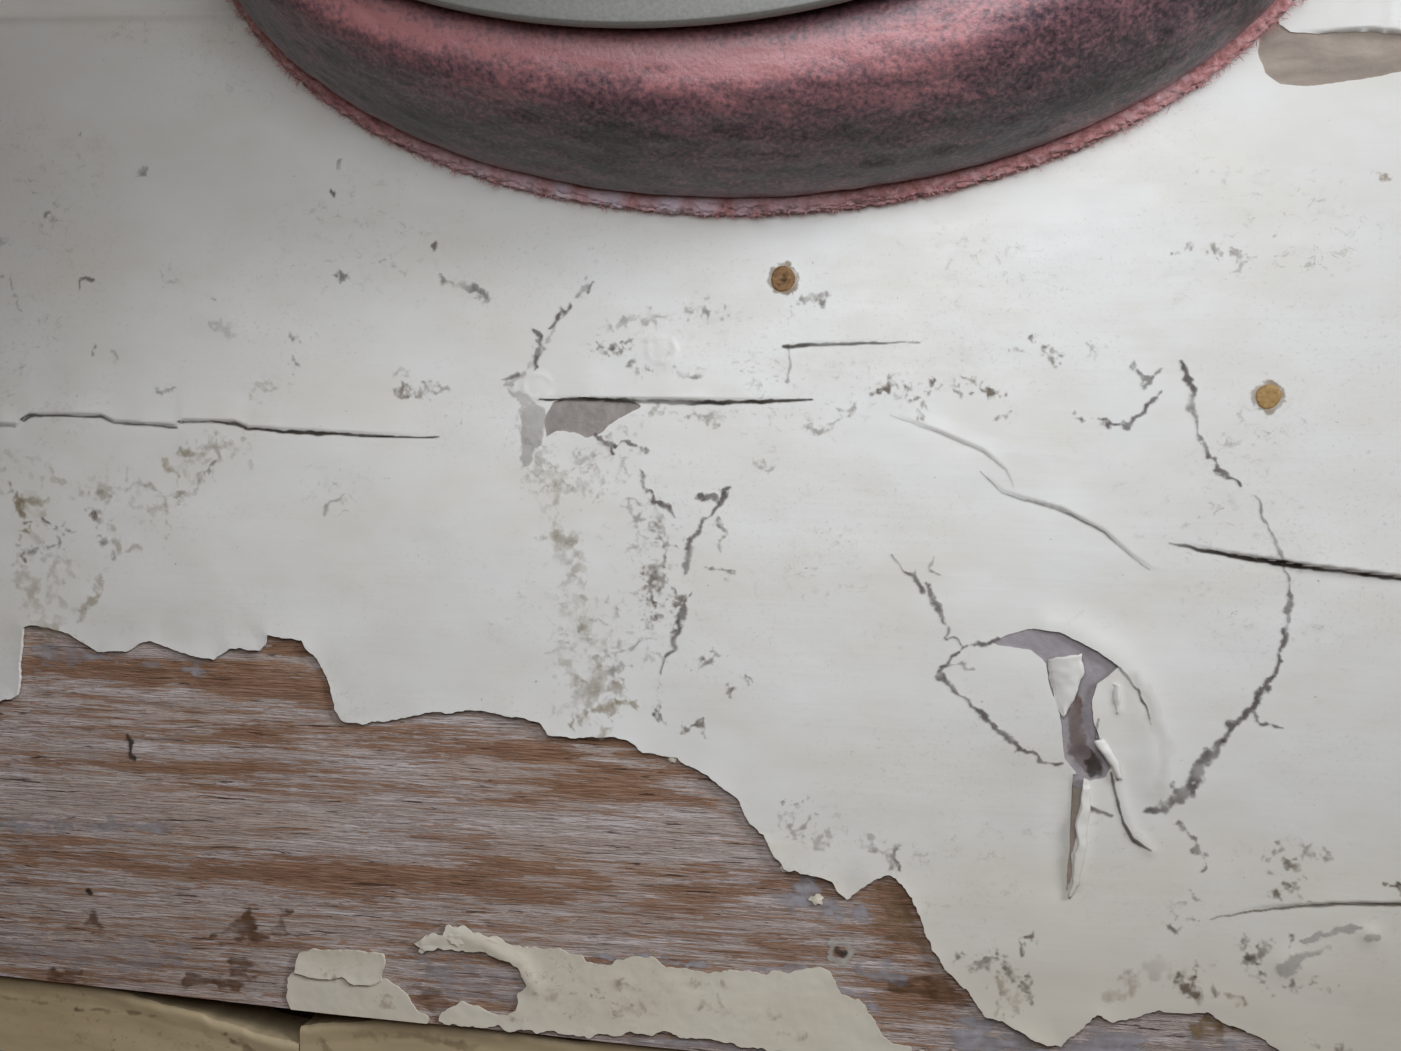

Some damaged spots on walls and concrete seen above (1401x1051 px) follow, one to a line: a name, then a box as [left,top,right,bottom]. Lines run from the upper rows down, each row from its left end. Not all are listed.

peeling [1258,22,1401,86]
crack [782,341,885,349]
crack [21,413,103,421]
crack [178,420,439,438]
peeling [521,397,641,466]
crack [688,398,813,406]
crack [1102,360,1262,513]
crack [510,292,730,658]
crack [904,571,1063,766]
crack [1091,544,1401,872]
peeling [0,625,1279,1051]
peeling [1278,924,1380,974]